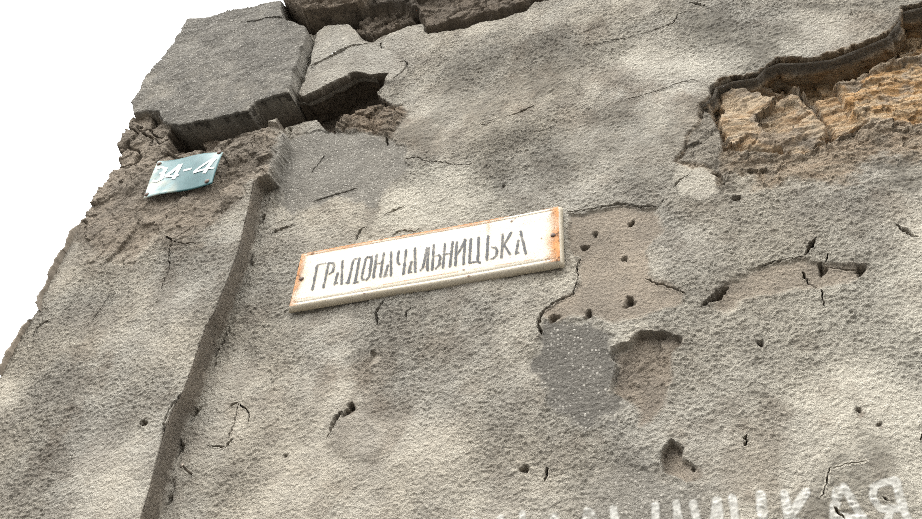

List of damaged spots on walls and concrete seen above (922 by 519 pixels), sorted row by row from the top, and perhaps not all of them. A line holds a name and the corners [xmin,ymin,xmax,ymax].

crack [244,15,288,23]
crack [309,42,409,79]
spalling [670,2,922,201]
crack [130,125,183,159]
flaking render [0,319,32,376]
crack [159,225,195,291]
spalling [35,72,413,519]
crack [535,257,582,335]
spalling [525,205,685,435]
crack [759,236,858,307]